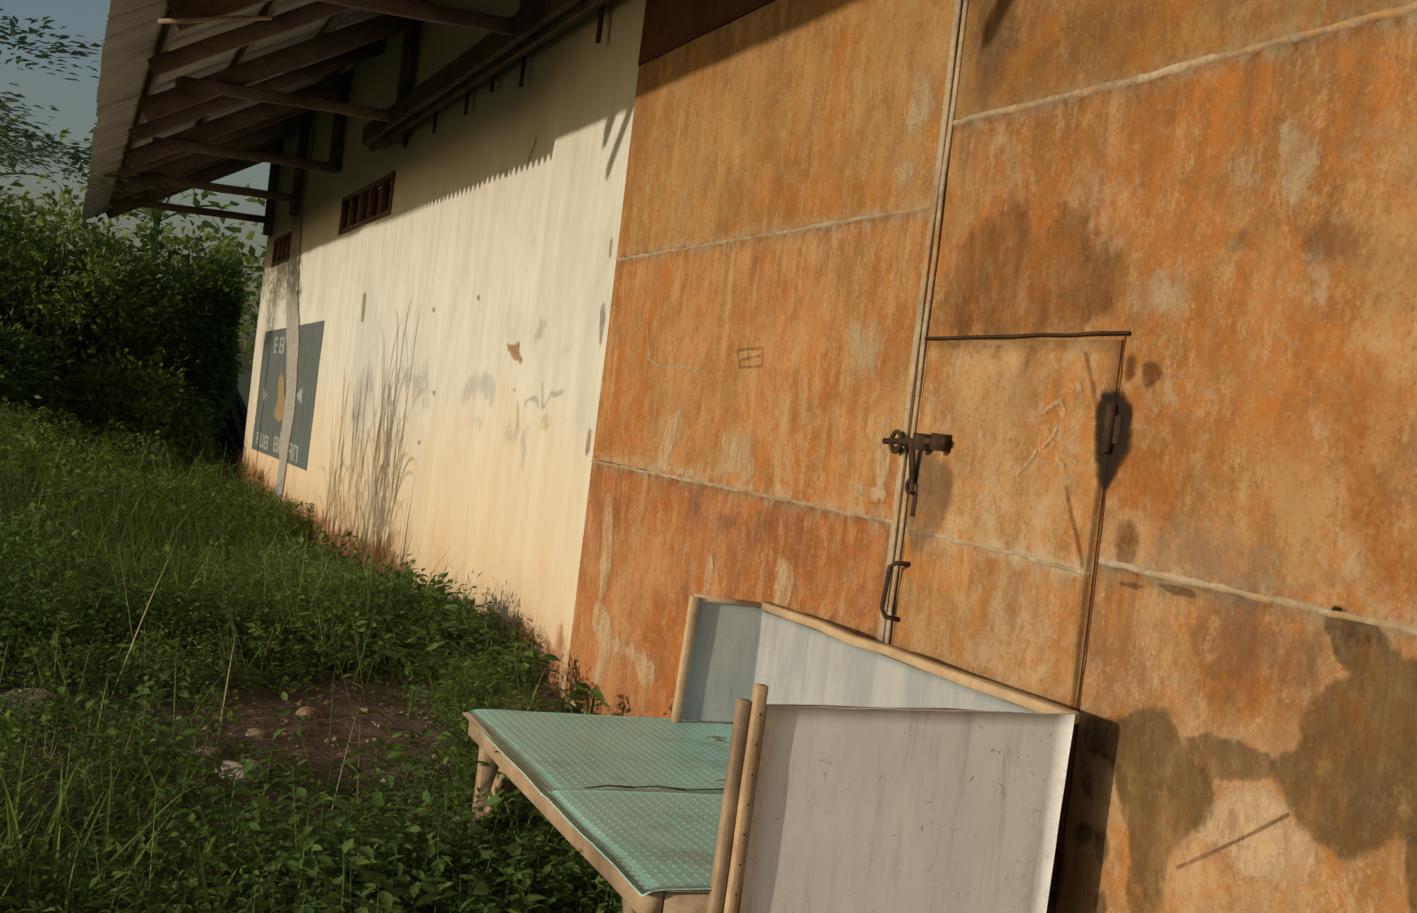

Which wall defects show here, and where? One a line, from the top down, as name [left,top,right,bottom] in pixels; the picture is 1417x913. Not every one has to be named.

spalling [507,342,521,364]
corrosion [1094,391,1132,488]